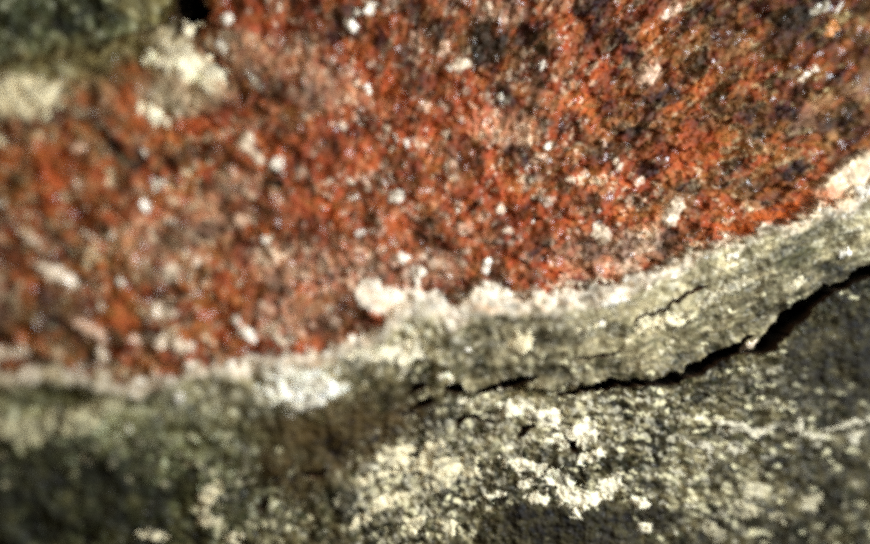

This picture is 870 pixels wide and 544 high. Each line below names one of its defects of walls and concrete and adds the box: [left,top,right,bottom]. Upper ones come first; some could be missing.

corrosion [116,83,148,132]
corrosion [743,202,799,233]
crack [557,264,870,396]